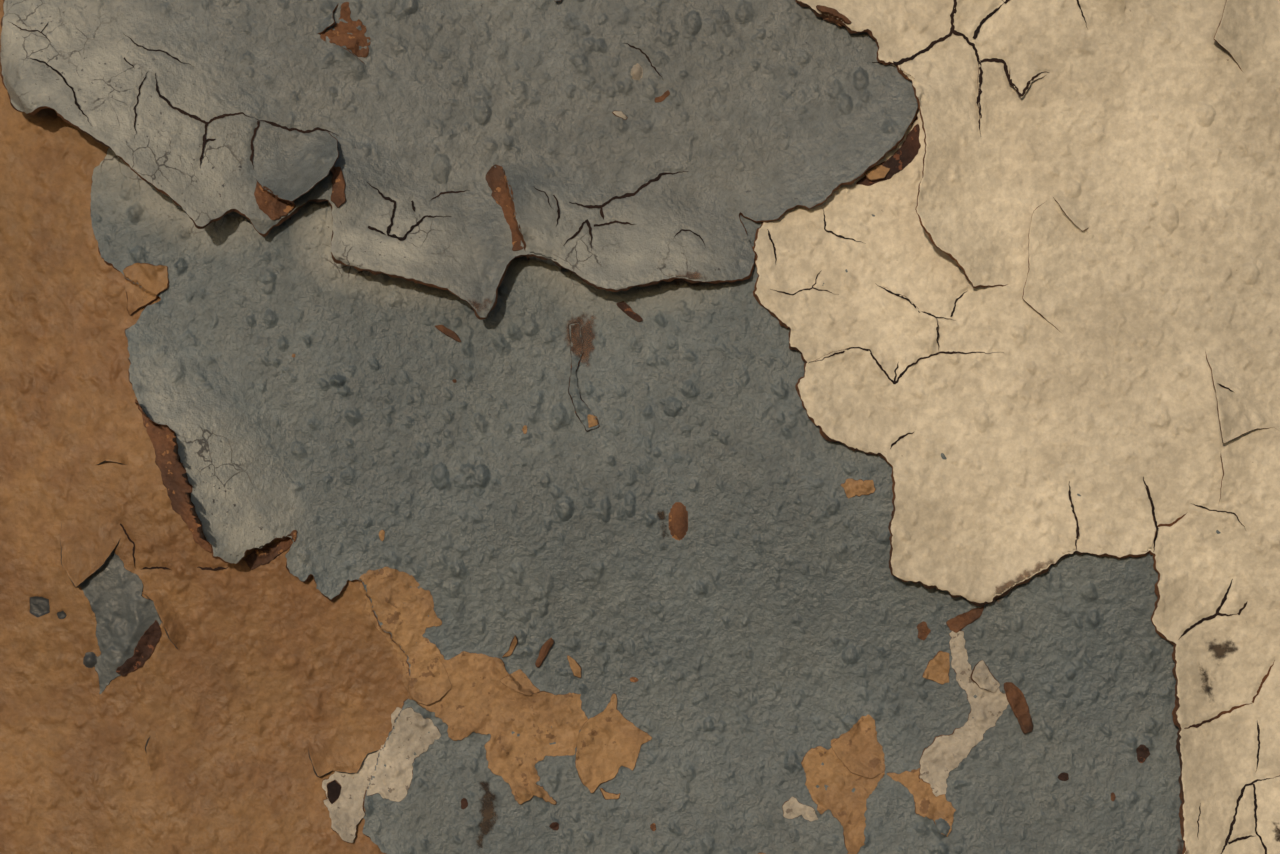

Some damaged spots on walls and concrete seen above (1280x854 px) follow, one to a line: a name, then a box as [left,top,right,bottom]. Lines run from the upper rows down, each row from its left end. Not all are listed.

crack [124,34,339,169]
crack [872,0,1049,135]
crack [534,171,688,251]
peeling [0,0,1157,607]
crack [809,283,1003,384]
peeling [1205,324,1280,507]
peeling [60,514,184,694]
peeling [114,263,652,854]
crack [1179,579,1247,639]
peeling [782,630,1033,854]
peeling [1155,620,1253,854]
crack [1184,660,1278,854]